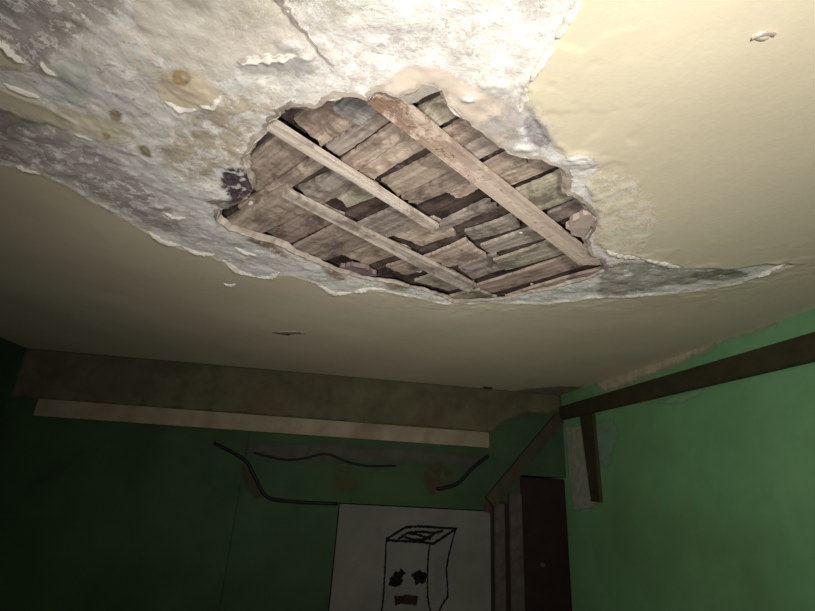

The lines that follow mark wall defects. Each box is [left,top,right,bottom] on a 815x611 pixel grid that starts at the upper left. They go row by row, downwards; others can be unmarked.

crack [275,0,335,66]
leakage [0,110,177,230]
peeling [0,0,792,305]
leakage [598,262,746,297]
peeling [566,425,597,511]
peeling [596,420,618,467]